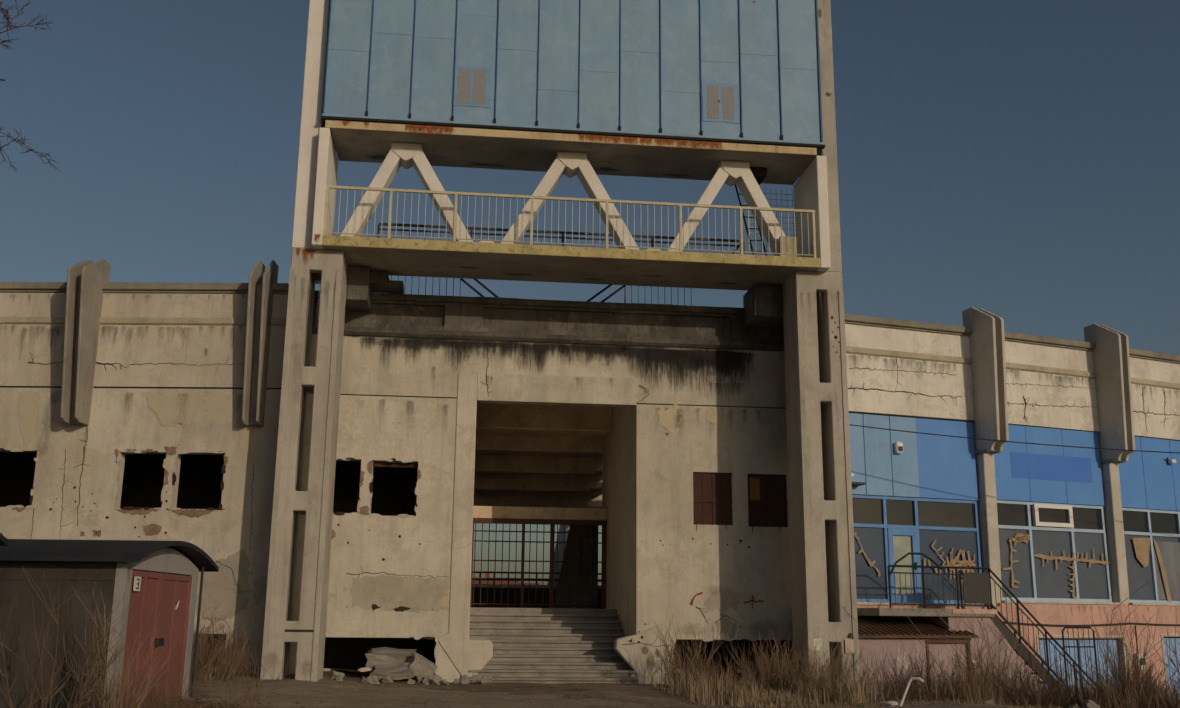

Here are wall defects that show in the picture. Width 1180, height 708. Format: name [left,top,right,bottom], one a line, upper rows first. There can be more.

corrosion [405,125,453,134]
corrosion [578,134,722,148]
crack [96,356,242,371]
water stain [353,336,753,386]
crack [27,425,88,537]
spalling [80,425,255,538]
spalling [0,486,35,512]